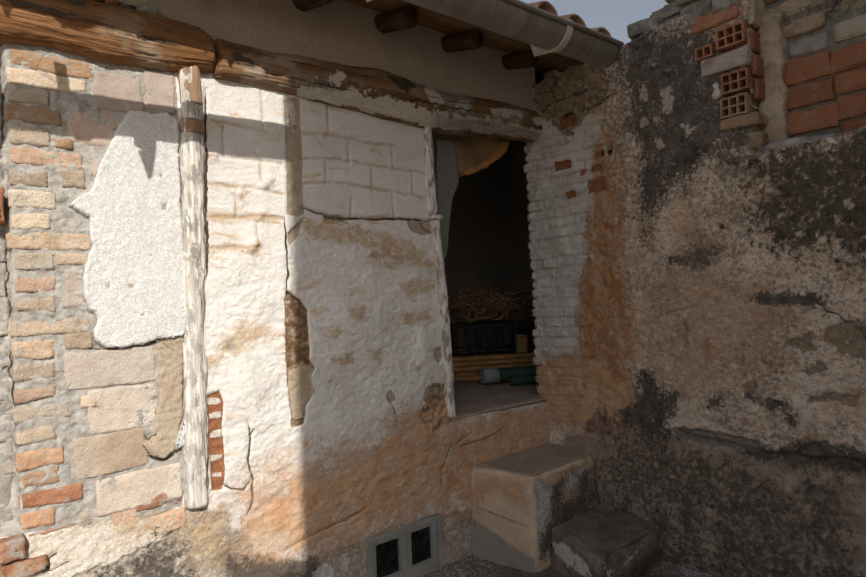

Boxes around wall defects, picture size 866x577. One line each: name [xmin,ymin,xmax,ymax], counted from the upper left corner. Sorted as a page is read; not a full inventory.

peeling [284,63,609,245]
water stain [608,23,866,277]
water stain [207,213,275,221]
crack [284,207,431,290]
water stain [305,220,424,267]
water stain [207,323,268,365]
flaking render [284,291,315,389]
crack [814,302,866,340]
flaking render [289,396,311,428]
water stain [220,245,832,577]
water stain [742,438,866,474]
water stain [94,515,218,577]